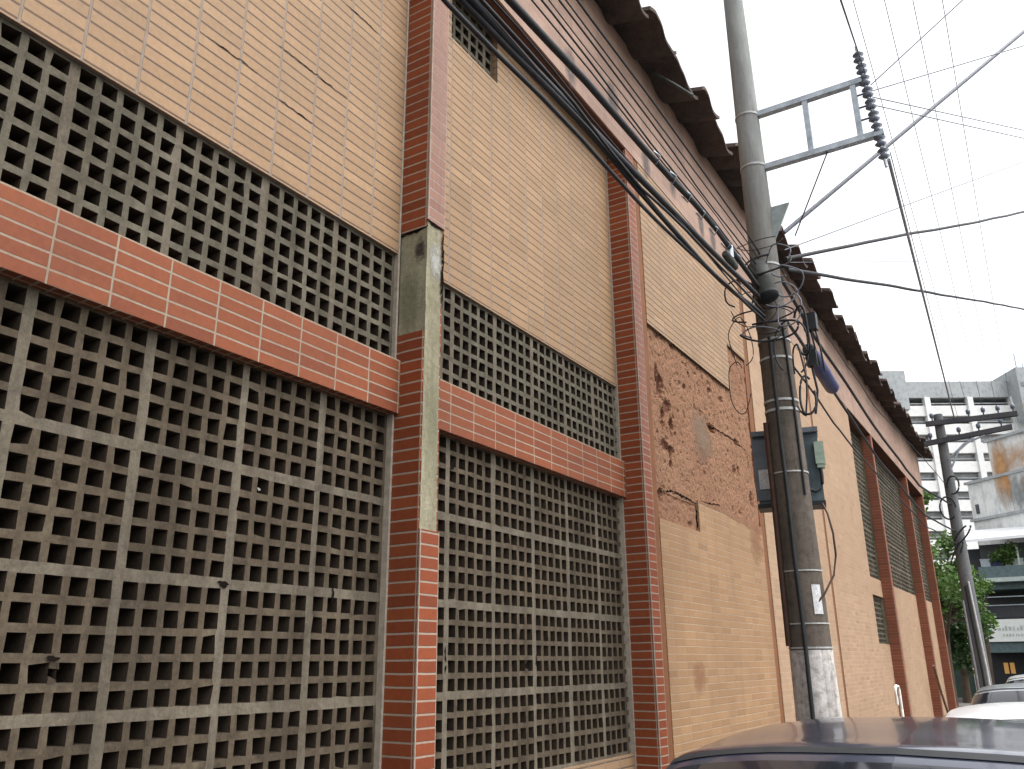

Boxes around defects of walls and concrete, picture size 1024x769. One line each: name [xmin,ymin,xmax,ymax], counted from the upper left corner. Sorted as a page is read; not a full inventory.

crack [660,490,720,528]
peeling [647,325,762,535]